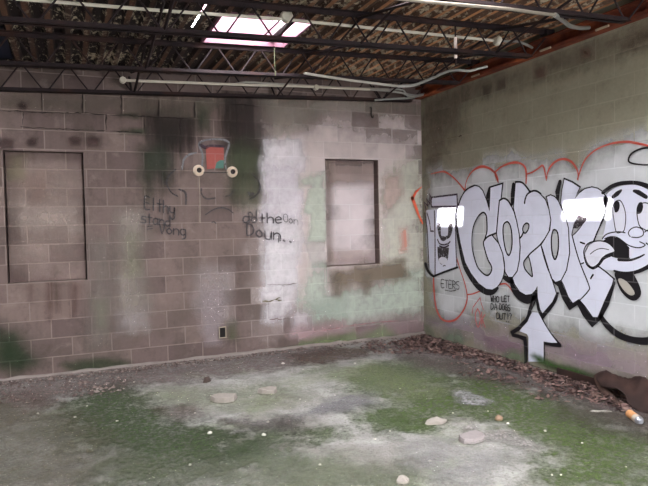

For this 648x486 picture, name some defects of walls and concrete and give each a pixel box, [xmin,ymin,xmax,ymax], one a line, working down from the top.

water stain [225,92,261,155]